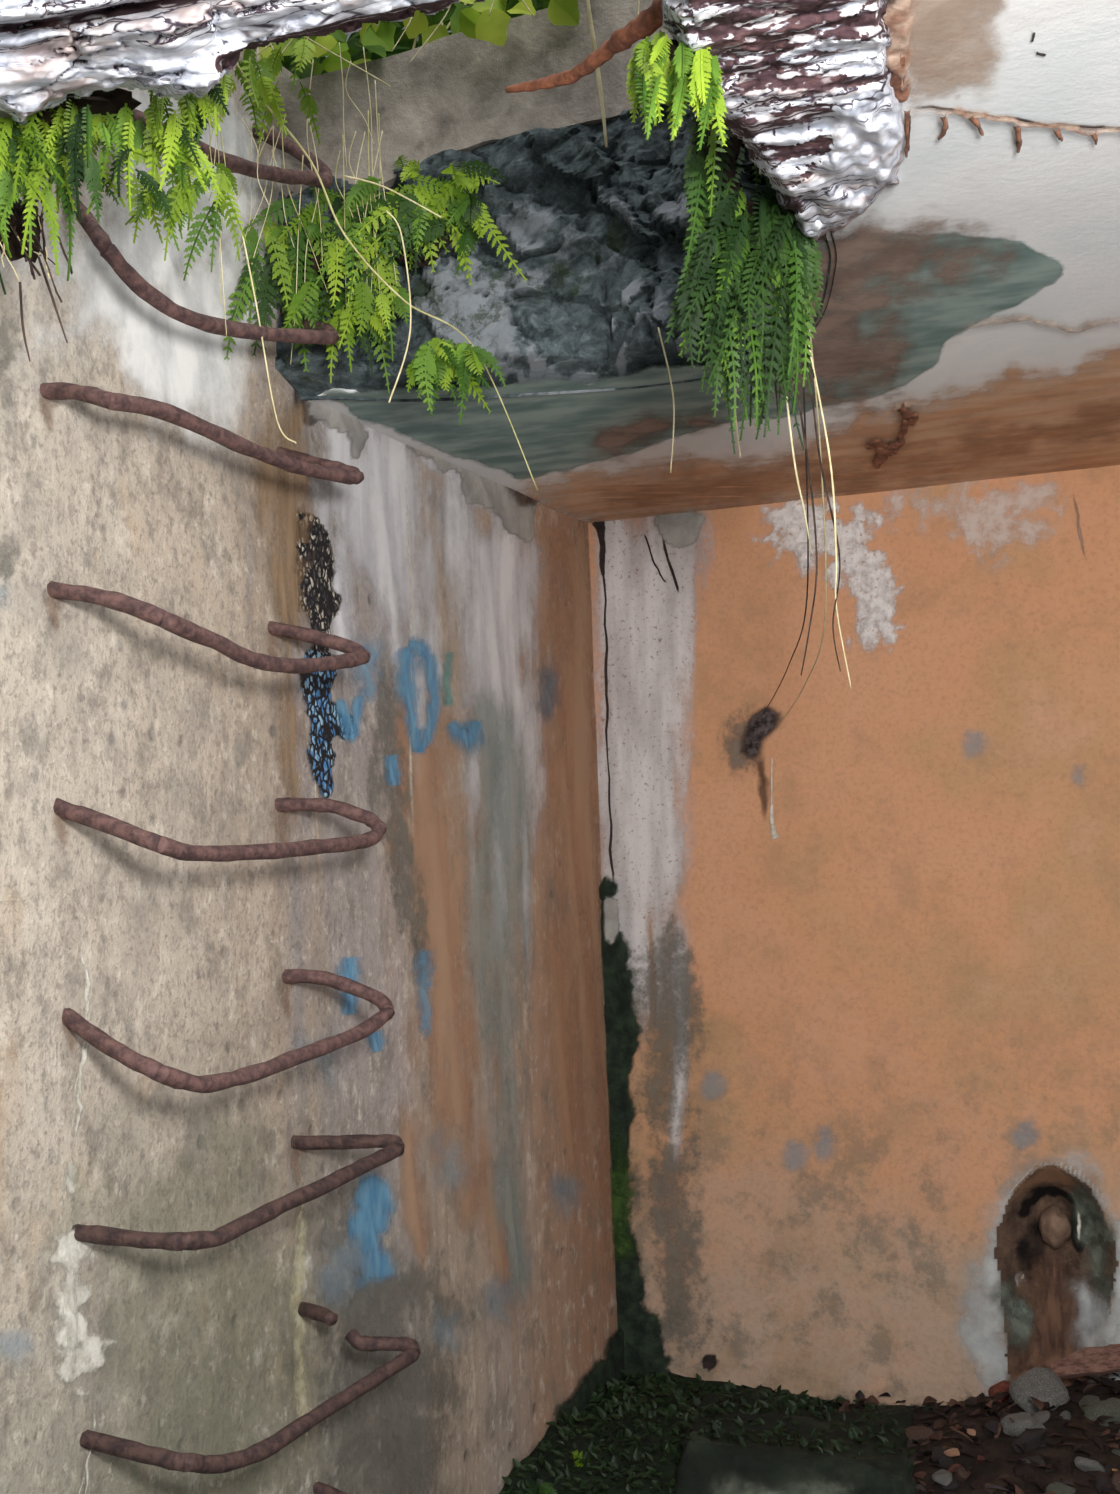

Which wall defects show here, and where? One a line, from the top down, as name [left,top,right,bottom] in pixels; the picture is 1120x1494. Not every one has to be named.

peeling [294,390,369,458]
spalling [865,402,919,468]
rust [258,406,309,798]
water stain [317,223,1120,1302]
crack [74,943,90,1132]
water stain [51,1230,116,1396]
water stain [960,1159,1104,1389]
water stain [1107,1222,1120,1345]
crack [79,1413,96,1494]